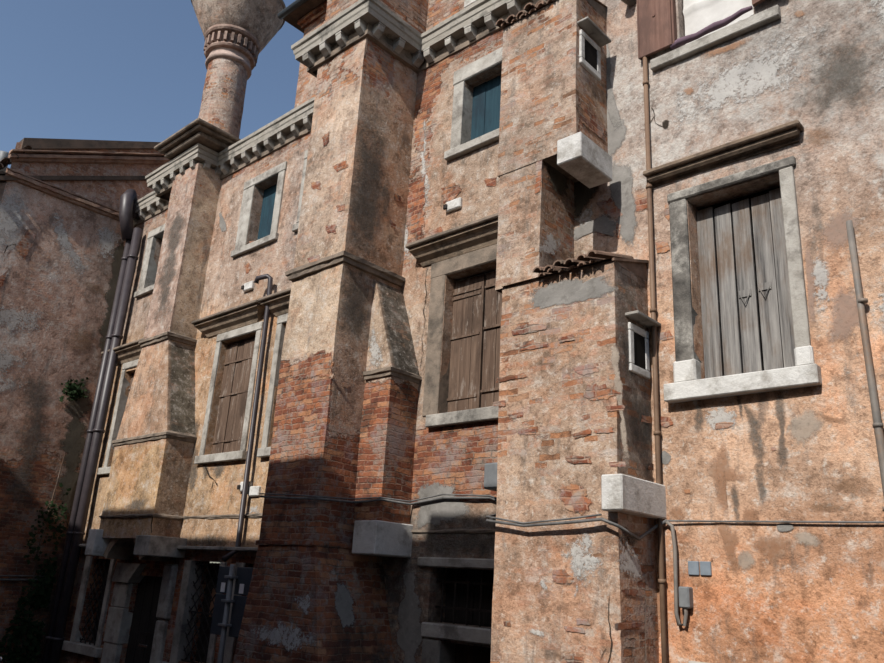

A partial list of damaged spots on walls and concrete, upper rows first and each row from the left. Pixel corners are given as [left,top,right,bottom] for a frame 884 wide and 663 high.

water stain [818,46,869,107]
peeling [574,44,647,244]
flaking render [539,233,561,255]
water stain [737,399,766,498]
water stain [776,392,786,464]
flaking render [539,534,602,596]
flaking render [613,542,642,578]
crack [600,595,612,662]
flaking render [614,620,643,631]